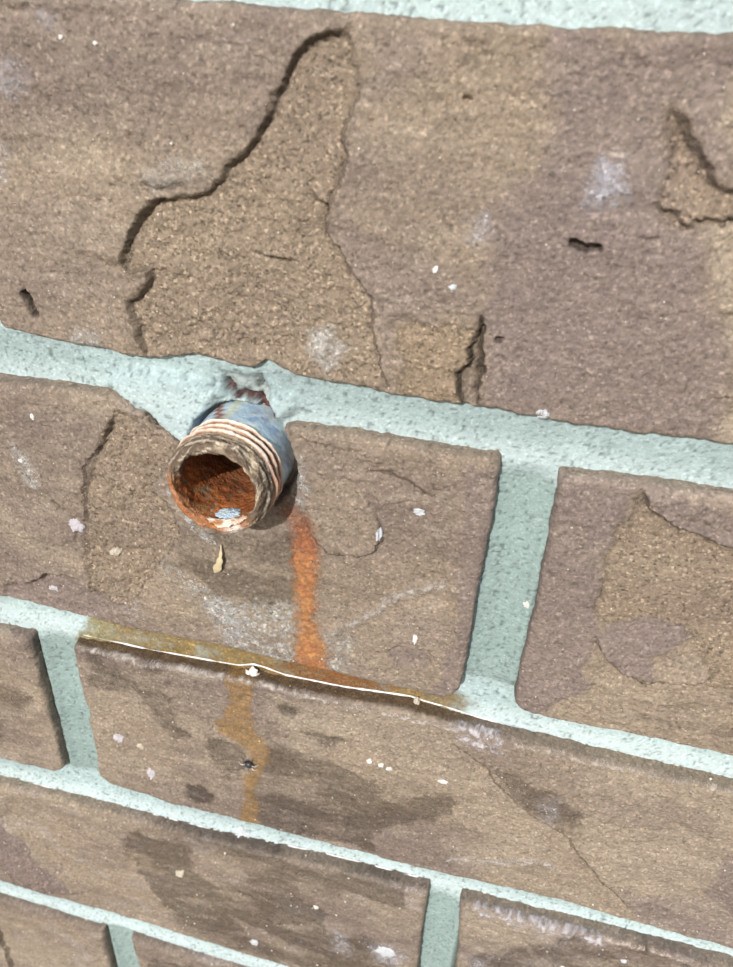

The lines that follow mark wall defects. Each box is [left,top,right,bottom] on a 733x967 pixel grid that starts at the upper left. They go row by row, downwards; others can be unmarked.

crack [118,21,352,356]
crack [297,86,389,386]
crack [657,108,733,229]
crack [455,314,486,406]
leakage [208,739,245,771]
rust [77,524,471,824]
leakage [84,555,503,754]
leakage [515,742,635,771]
spalling [593,499,733,689]
crack [0,930,14,967]
leakage [125,746,453,967]
leakage [472,902,688,967]